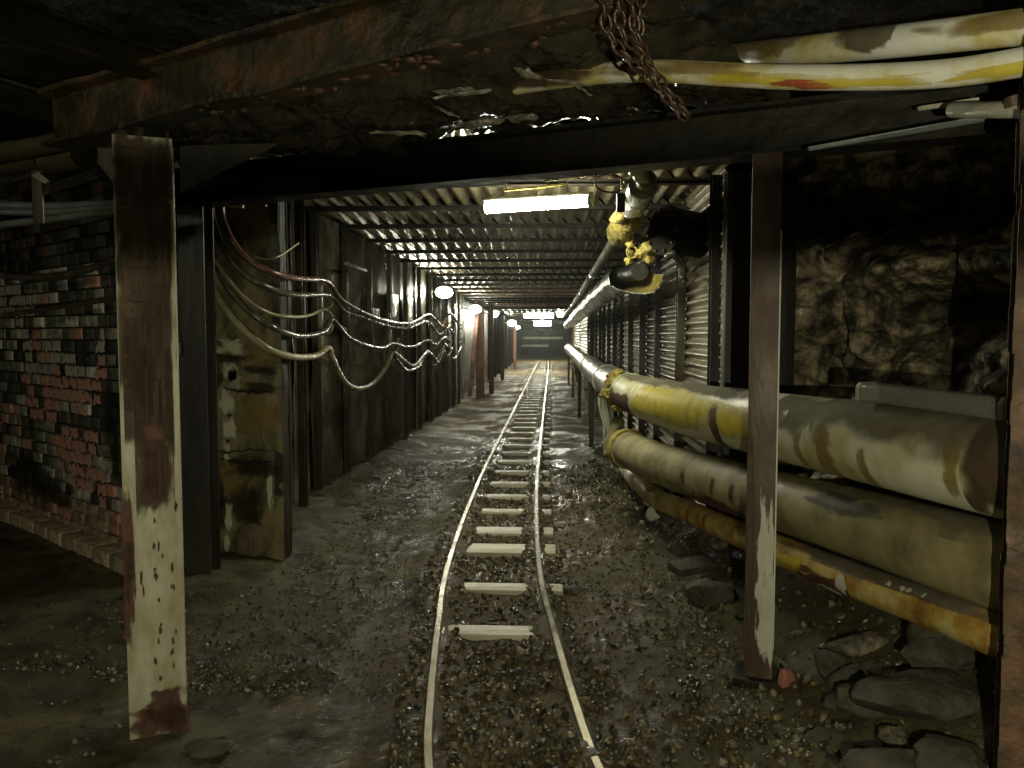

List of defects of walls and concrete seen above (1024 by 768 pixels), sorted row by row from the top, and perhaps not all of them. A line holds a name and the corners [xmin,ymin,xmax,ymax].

corrosion [771,79,834,90]
corrosion [112,130,178,644]
peeling [755,498,774,668]
corrosion [794,565,852,599]
corrosion [129,657,193,738]